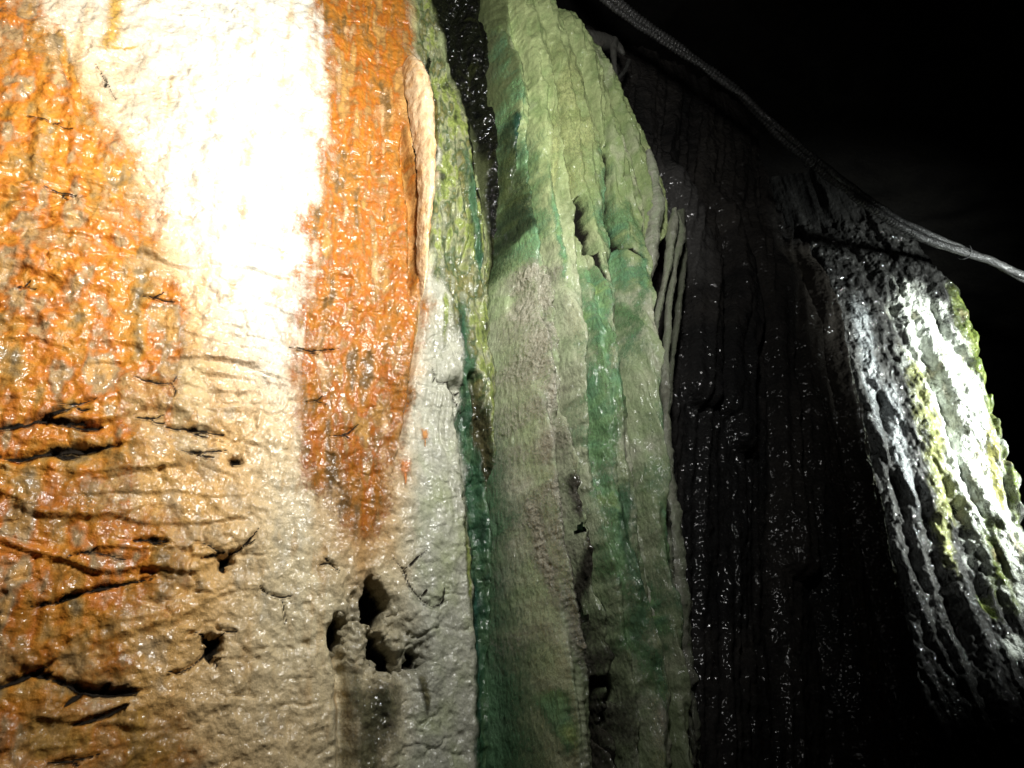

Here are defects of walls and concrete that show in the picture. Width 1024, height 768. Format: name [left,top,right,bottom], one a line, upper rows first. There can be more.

corrosion [288,0,429,538]
water stain [432,0,576,490]
crack [0,397,122,463]
corrosion [0,0,220,768]
crack [0,664,138,725]
crack [30,538,168,607]
spalling [200,633,222,664]
crack [200,528,259,559]
spalling [326,611,348,658]
spalling [358,575,426,672]
water stain [465,508,480,717]
water stain [522,473,637,768]